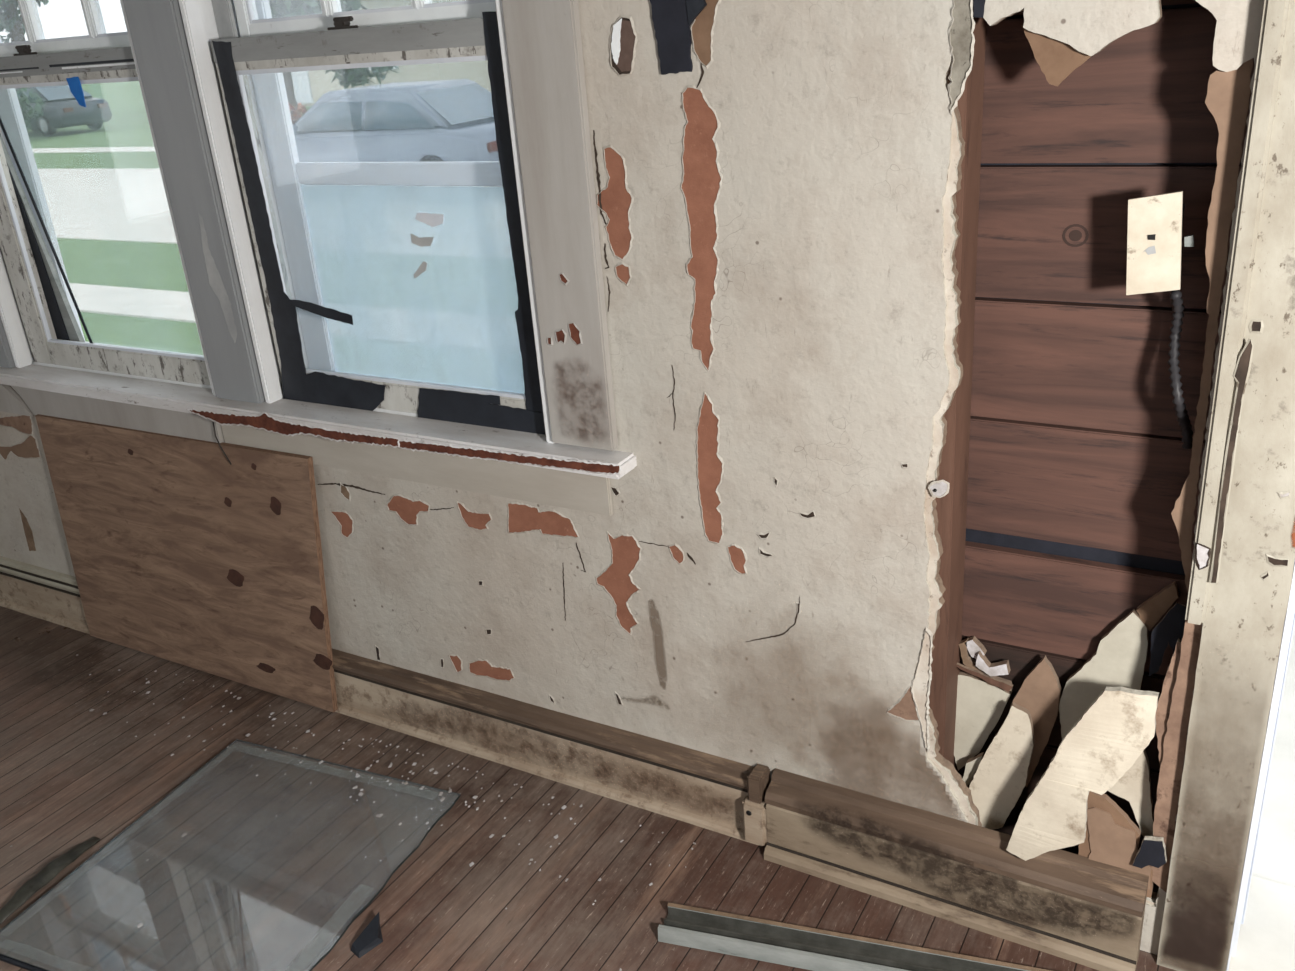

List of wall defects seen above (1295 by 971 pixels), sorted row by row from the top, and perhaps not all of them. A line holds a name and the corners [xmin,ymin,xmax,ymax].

peeling [690,0,722,69]
spalling [947,0,975,114]
peeling [596,145,634,286]
peeling [680,85,723,372]
peeling [186,408,621,496]
peeling [456,500,580,539]
peeling [596,531,642,635]
peeling [695,392,773,575]
peeling [1195,543,1211,570]
spalling [910,627,933,753]
leakage [811,809,1132,934]
leakage [1164,899,1226,968]